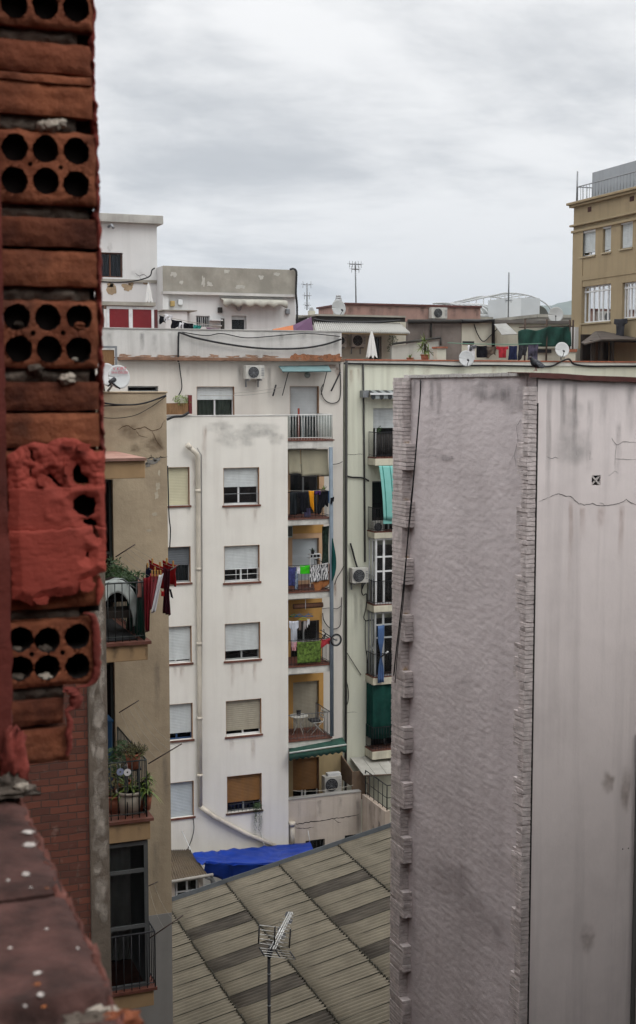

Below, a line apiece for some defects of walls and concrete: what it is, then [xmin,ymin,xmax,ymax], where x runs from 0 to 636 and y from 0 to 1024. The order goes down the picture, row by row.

flaking render [6,0,148,759]
crack [118,423,165,459]
crack [543,494,636,506]
peeling [94,788,107,915]